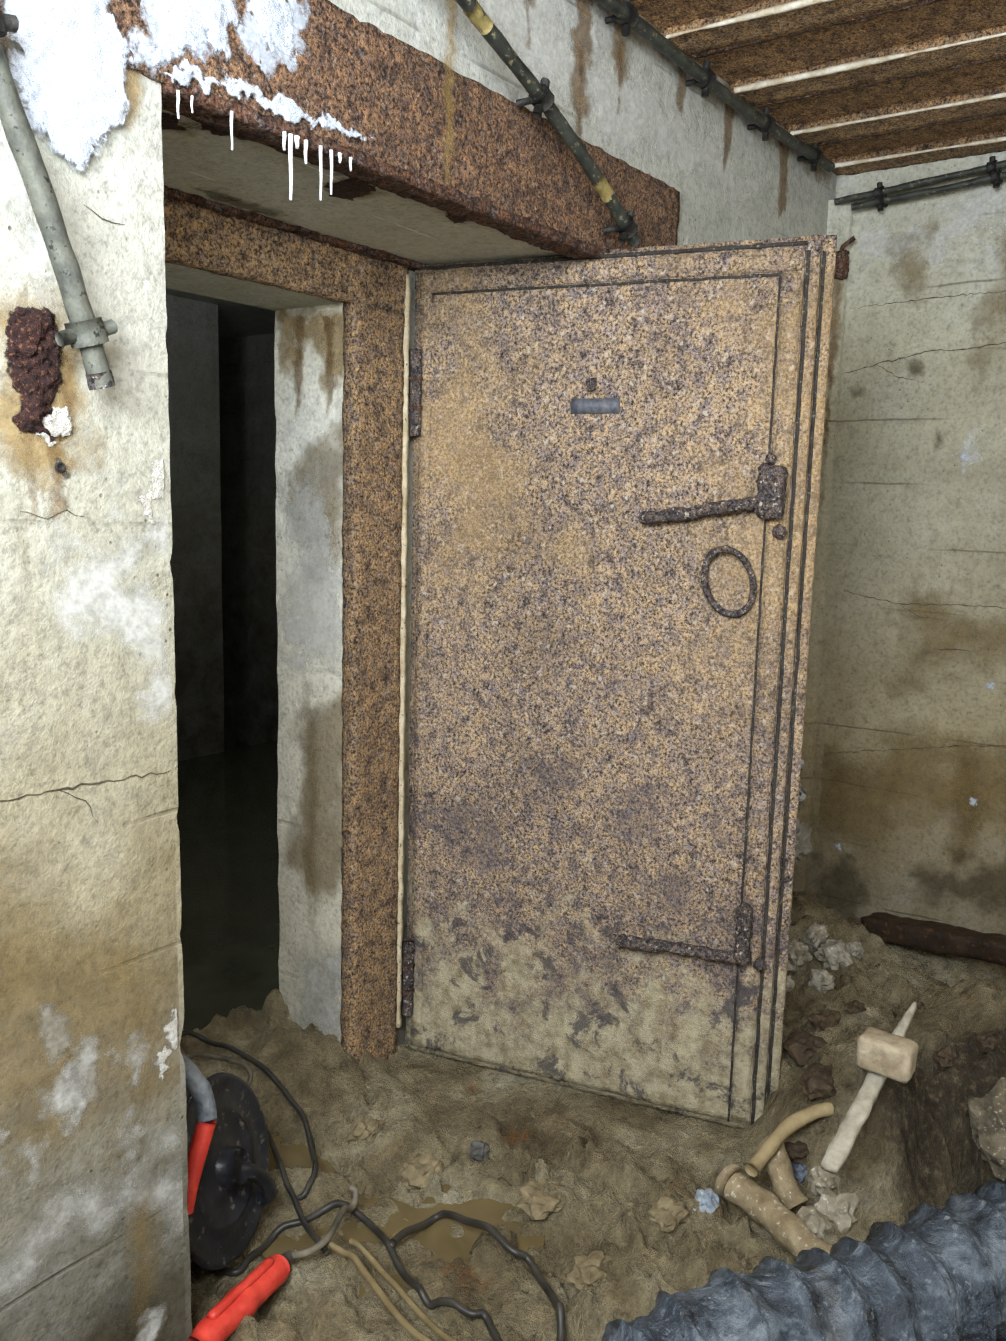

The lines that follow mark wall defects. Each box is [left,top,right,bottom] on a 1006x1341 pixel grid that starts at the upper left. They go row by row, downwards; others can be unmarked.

water stain [4,0,373,201]
corrosion [573,0,591,131]
corrosion [608,0,625,84]
corrosion [724,104,734,165]
corrosion [779,142,788,215]
corrosion [828,278,841,382]
corrosion [46,346,77,412]
corrosion [0,388,71,481]
crack [0,770,171,823]
water stain [40,1005,97,1113]
water stain [0,1182,183,1290]
water stain [90,1292,163,1341]